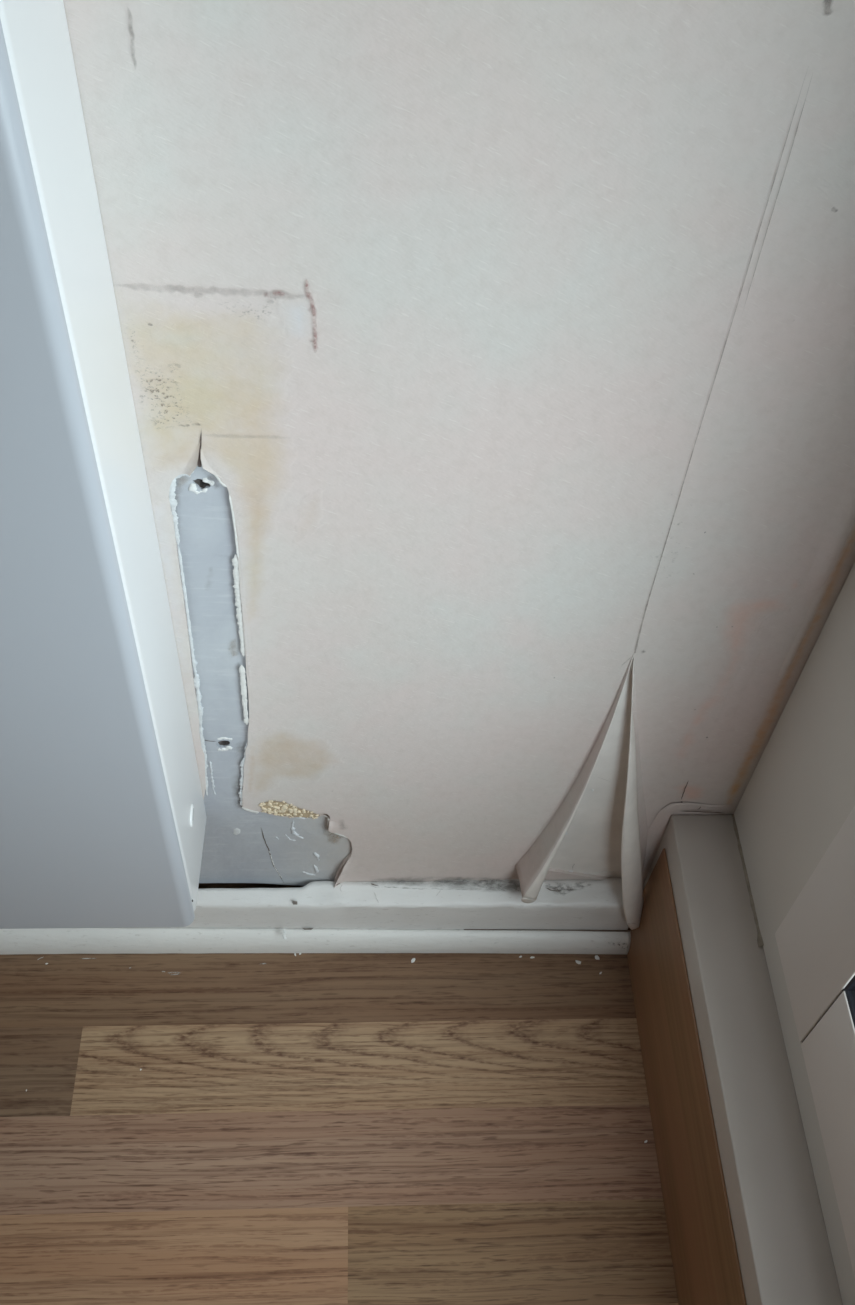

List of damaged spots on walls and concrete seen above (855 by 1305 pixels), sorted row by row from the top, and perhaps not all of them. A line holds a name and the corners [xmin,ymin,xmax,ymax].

water stain [113,284,326,685]
peeling [169,466,362,888]
crack [635,455,692,652]